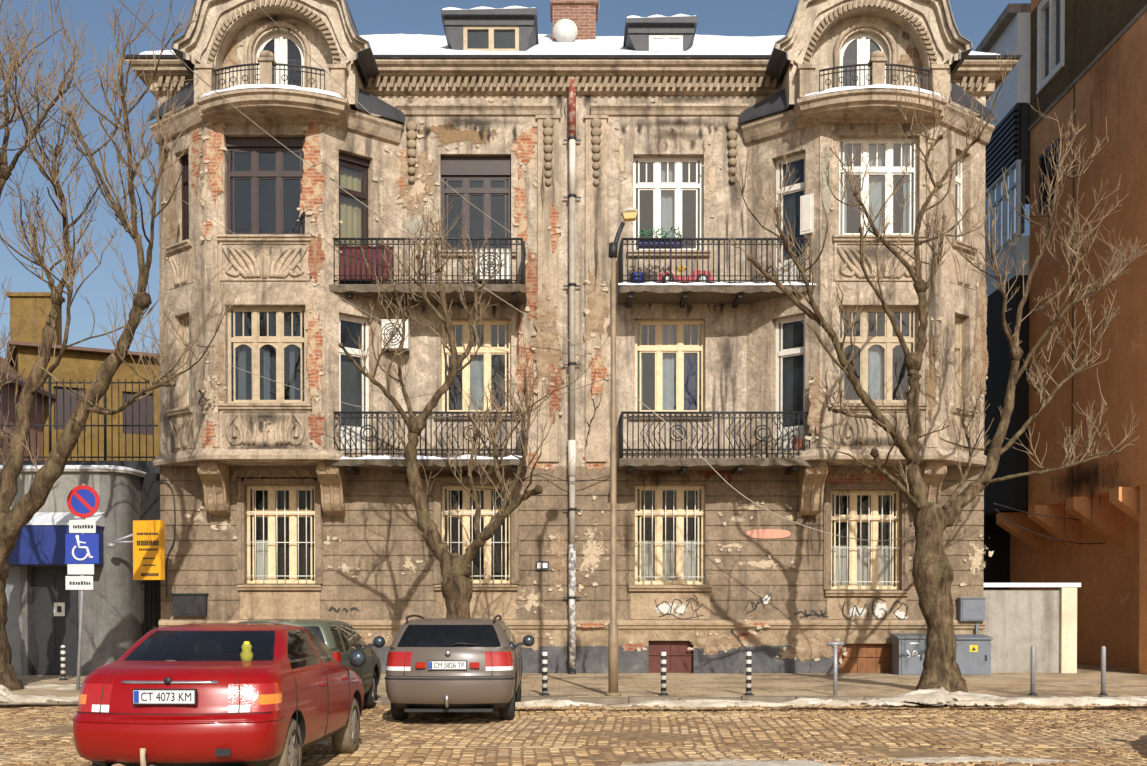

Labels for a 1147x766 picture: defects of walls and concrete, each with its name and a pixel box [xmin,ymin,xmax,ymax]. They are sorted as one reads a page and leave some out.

flaking render [190,122,228,241]
flaking render [297,123,343,286]
flaking render [340,121,565,424]
flaking render [305,300,325,449]
flaking render [960,534,994,587]
flaking render [687,619,773,655]
flaking render [775,637,847,664]